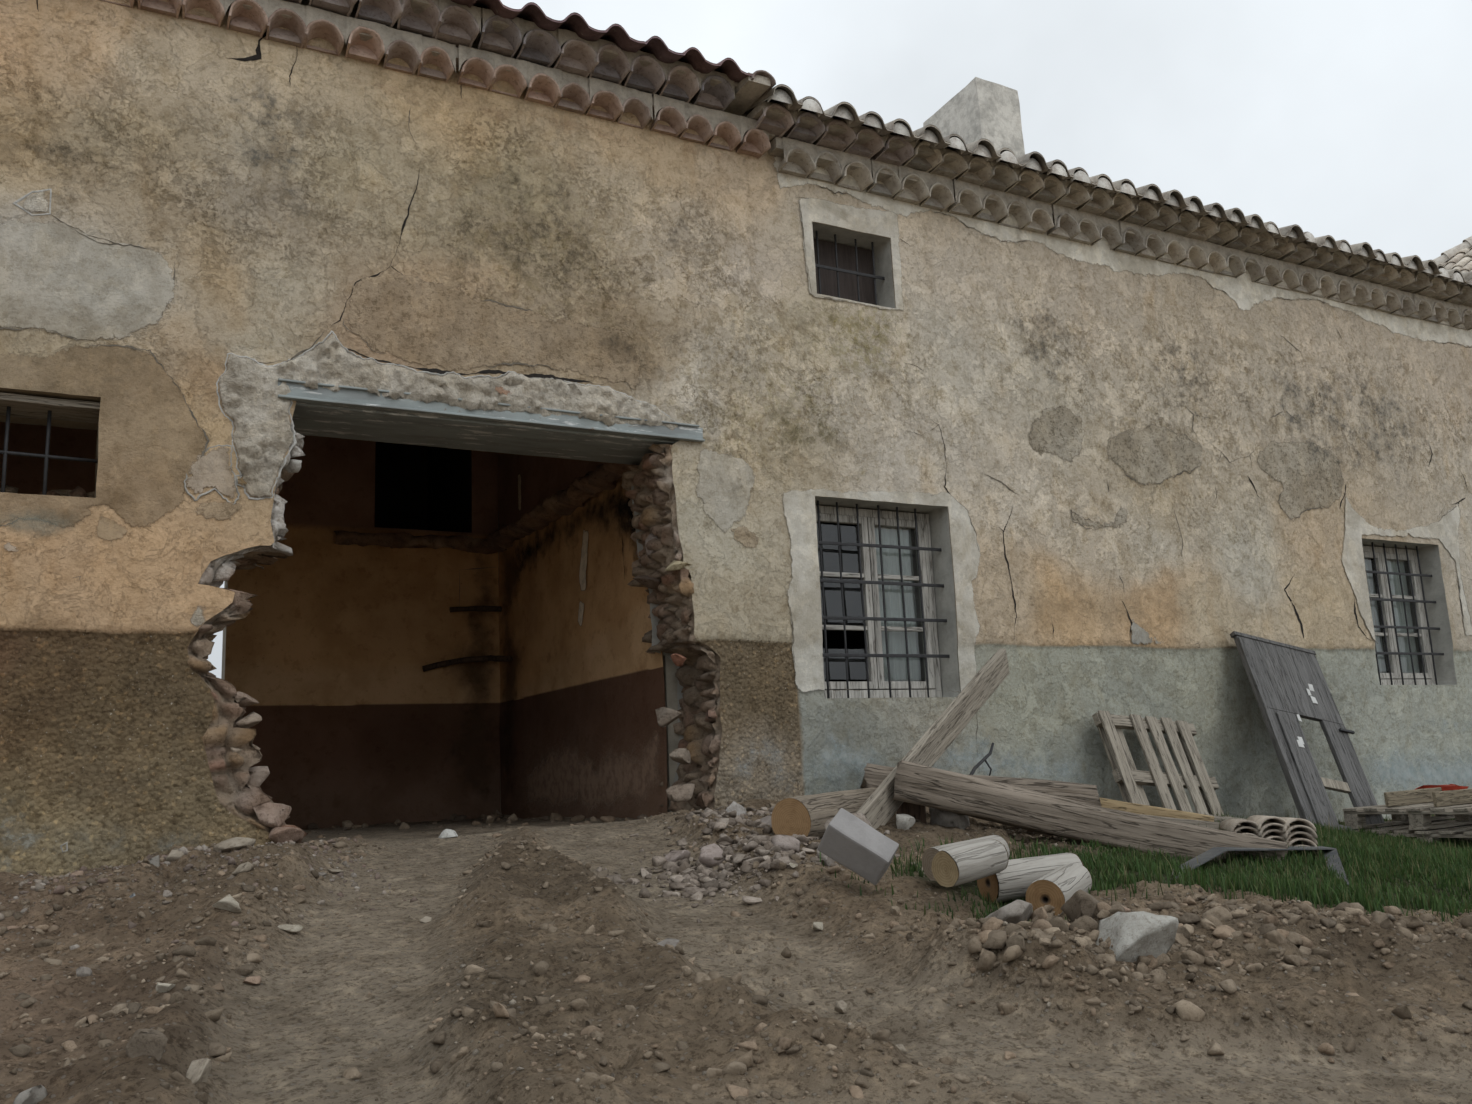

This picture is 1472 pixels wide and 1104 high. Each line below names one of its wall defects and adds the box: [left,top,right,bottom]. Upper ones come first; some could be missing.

crack [259,108,602,385]
peeling [773,156,1472,348]
flaking render [0,189,678,552]
flaking render [1029,405,1084,462]
flaking render [1108,424,1202,485]
spalling [230,691,304,844]